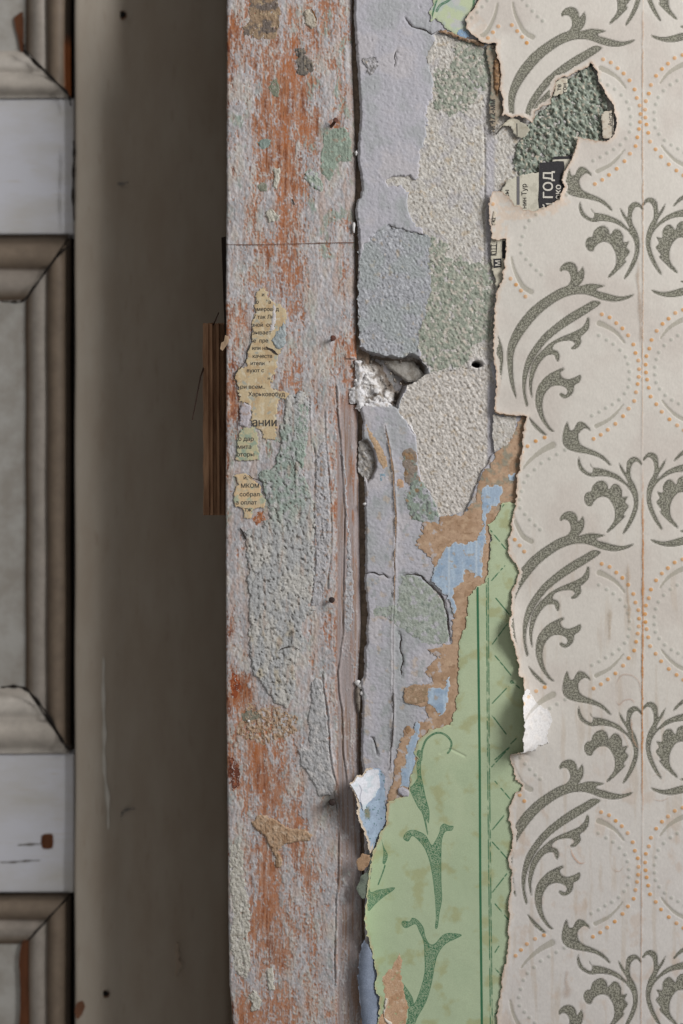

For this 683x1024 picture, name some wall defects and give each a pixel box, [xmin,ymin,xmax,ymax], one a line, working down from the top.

peeling [295,47,314,76]
peeling [273,167,281,190]
spalling [349,32,617,516]
peeling [237,390,375,746]
peeling [522,689,552,753]